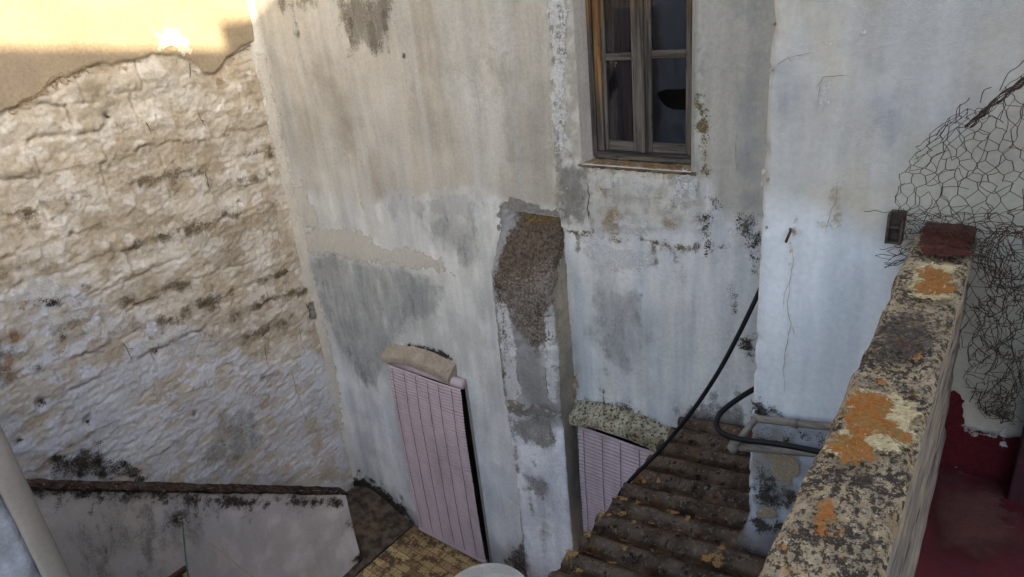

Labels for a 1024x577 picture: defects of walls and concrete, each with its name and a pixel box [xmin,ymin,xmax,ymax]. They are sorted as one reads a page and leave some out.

peeling [155,27,193,57]
water stain [337,0,392,54]
flaking render [6,60,140,114]
mould [695,94,711,176]
peeling [256,49,455,442]
mould [698,199,762,273]
crack [782,242,795,384]
peeling [962,425,1007,447]
water stain [32,440,344,560]